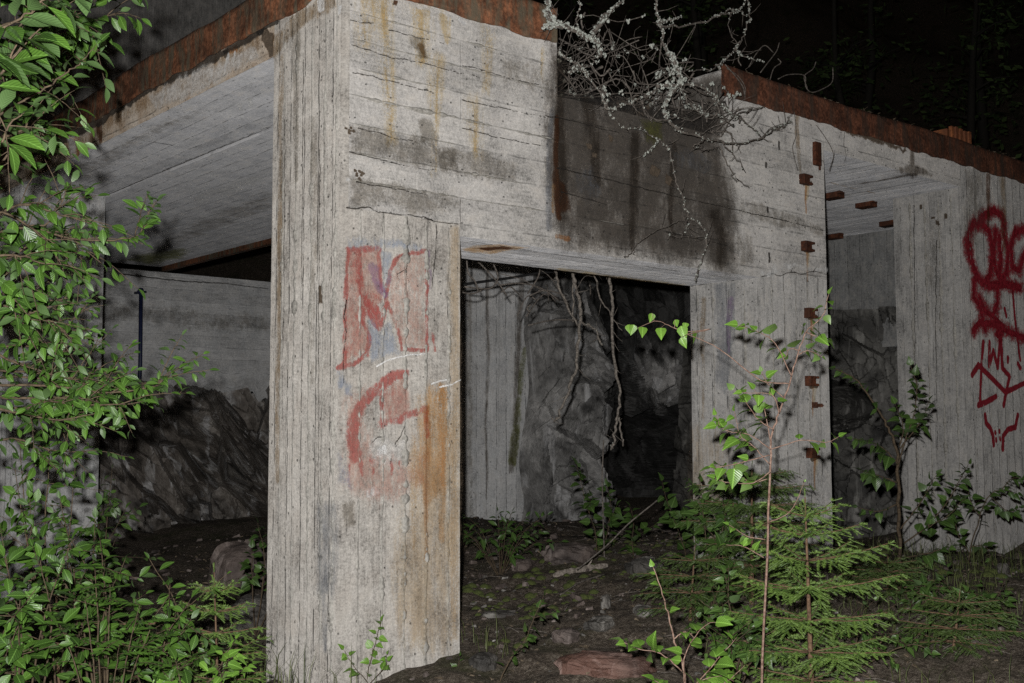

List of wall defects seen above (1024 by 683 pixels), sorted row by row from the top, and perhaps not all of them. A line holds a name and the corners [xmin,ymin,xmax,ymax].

rust [554,117,565,219]
leakage [551,78,734,263]